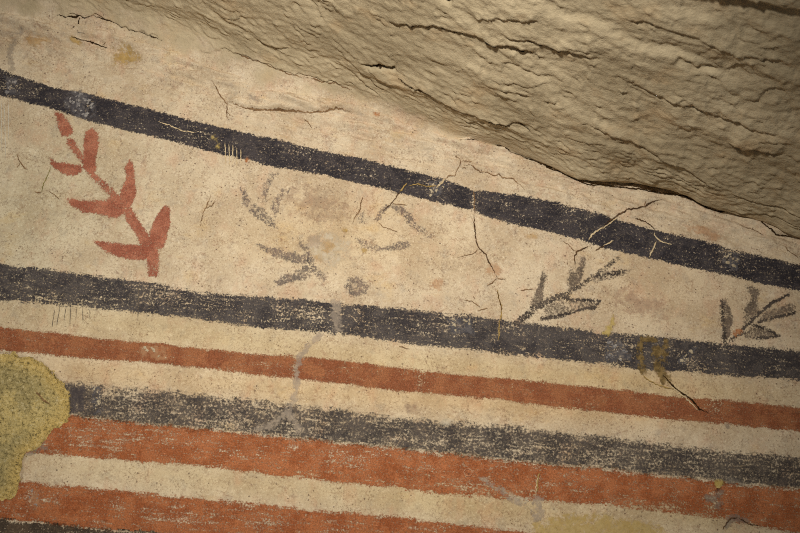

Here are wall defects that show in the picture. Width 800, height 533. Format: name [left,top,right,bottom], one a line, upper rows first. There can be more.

crack [59,14,158,48]
crack [380,138,521,231]
crack [497,145,725,262]
crack [466,191,506,340]
crack [641,373,708,413]